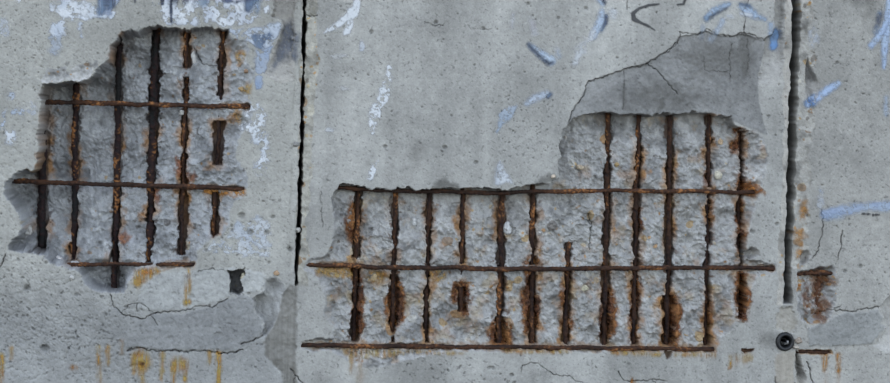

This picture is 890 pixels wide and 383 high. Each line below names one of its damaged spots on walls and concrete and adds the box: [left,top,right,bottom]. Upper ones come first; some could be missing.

spalling [2,24,256,295]
spalling [262,0,838,370]
corrosion [729,128,740,154]
corrosion [734,174,765,252]
spalling [253,275,287,339]
corrosion [317,267,406,334]
corrosion [451,280,471,316]
corrosion [487,318,540,353]
corrosion [520,256,541,333]
corrosion [598,270,641,340]
corrosion [661,292,695,356]
corrosion [734,271,752,321]